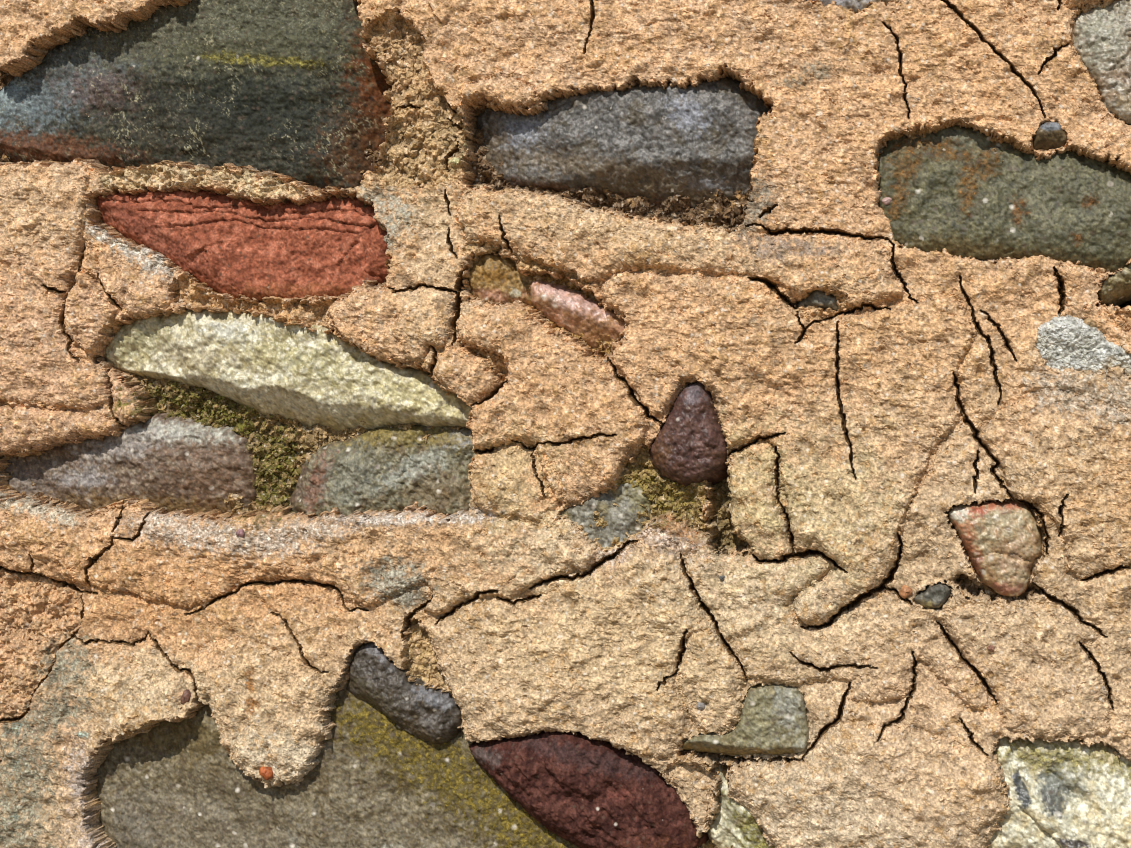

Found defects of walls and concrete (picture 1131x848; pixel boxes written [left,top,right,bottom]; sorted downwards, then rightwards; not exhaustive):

crack [941,0,1070,117]
spalling [99,162,305,199]
peeling [108,372,147,425]
peeling [63,244,508,403]
crack [746,205,918,480]
crack [960,277,1016,404]
crack [953,373,1068,554]
crack [0,506,198,723]
crack [401,541,637,638]
crack [728,433,917,757]
crack [1033,582,1113,708]
peeling [665,763,716,830]